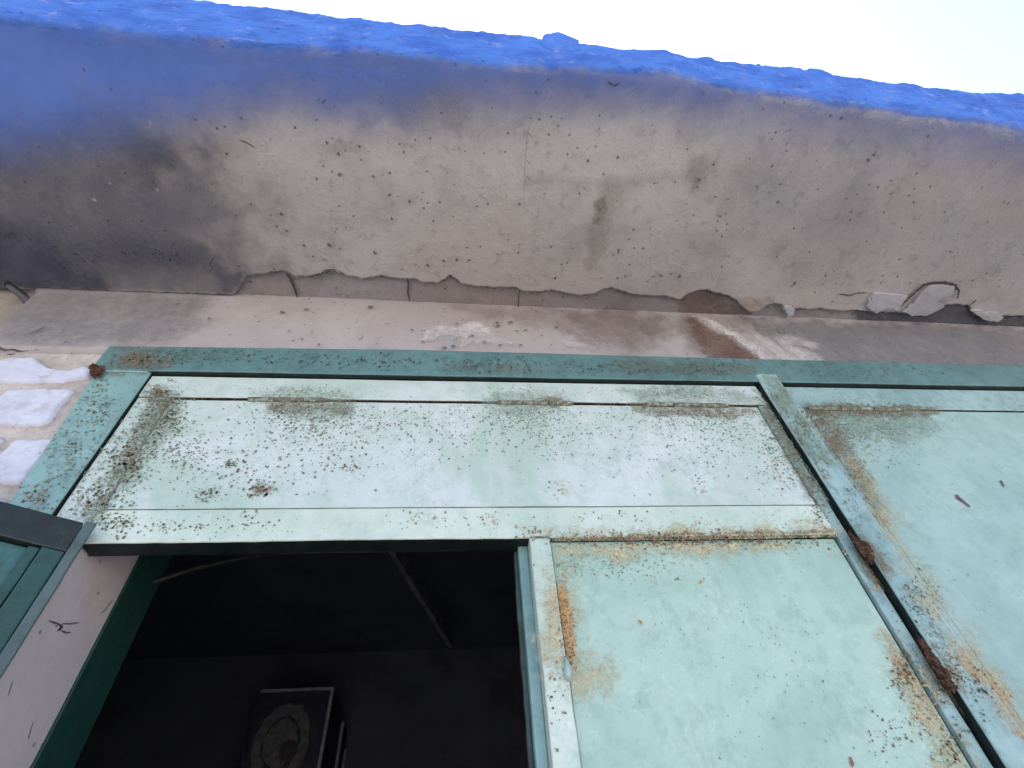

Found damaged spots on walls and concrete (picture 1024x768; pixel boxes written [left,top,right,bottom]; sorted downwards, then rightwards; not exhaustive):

spalling [235,245,1020,349]
water stain [697,305,1024,366]
corrosion [16,294,1018,768]